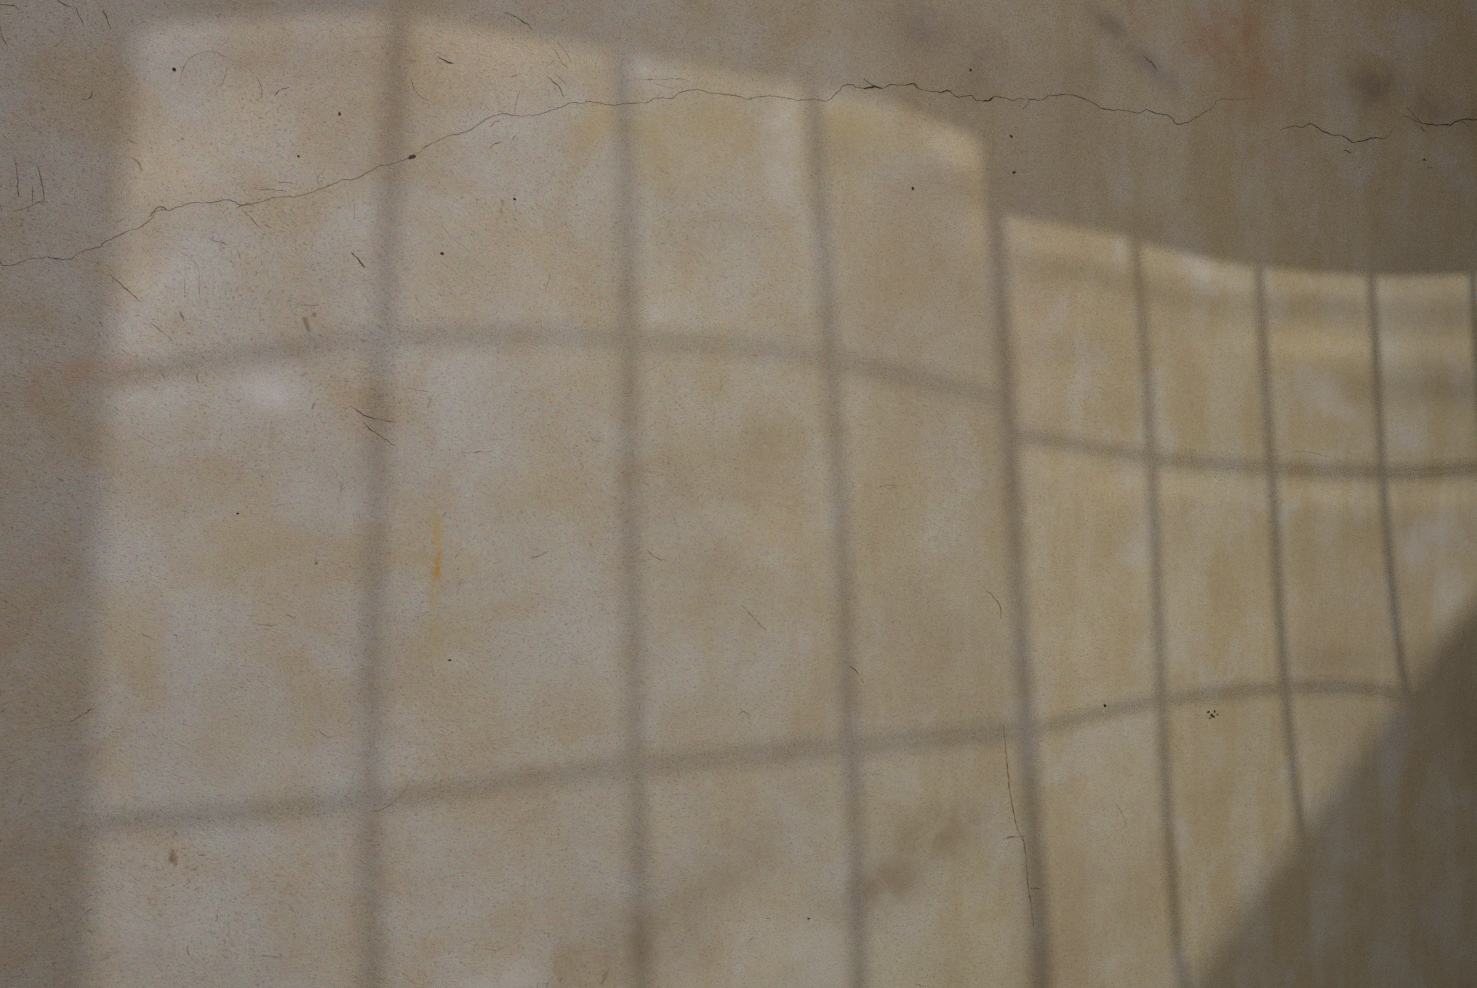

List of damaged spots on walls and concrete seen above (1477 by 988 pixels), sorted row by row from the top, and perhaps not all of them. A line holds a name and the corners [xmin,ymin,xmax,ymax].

crack [0,79,1251,266]